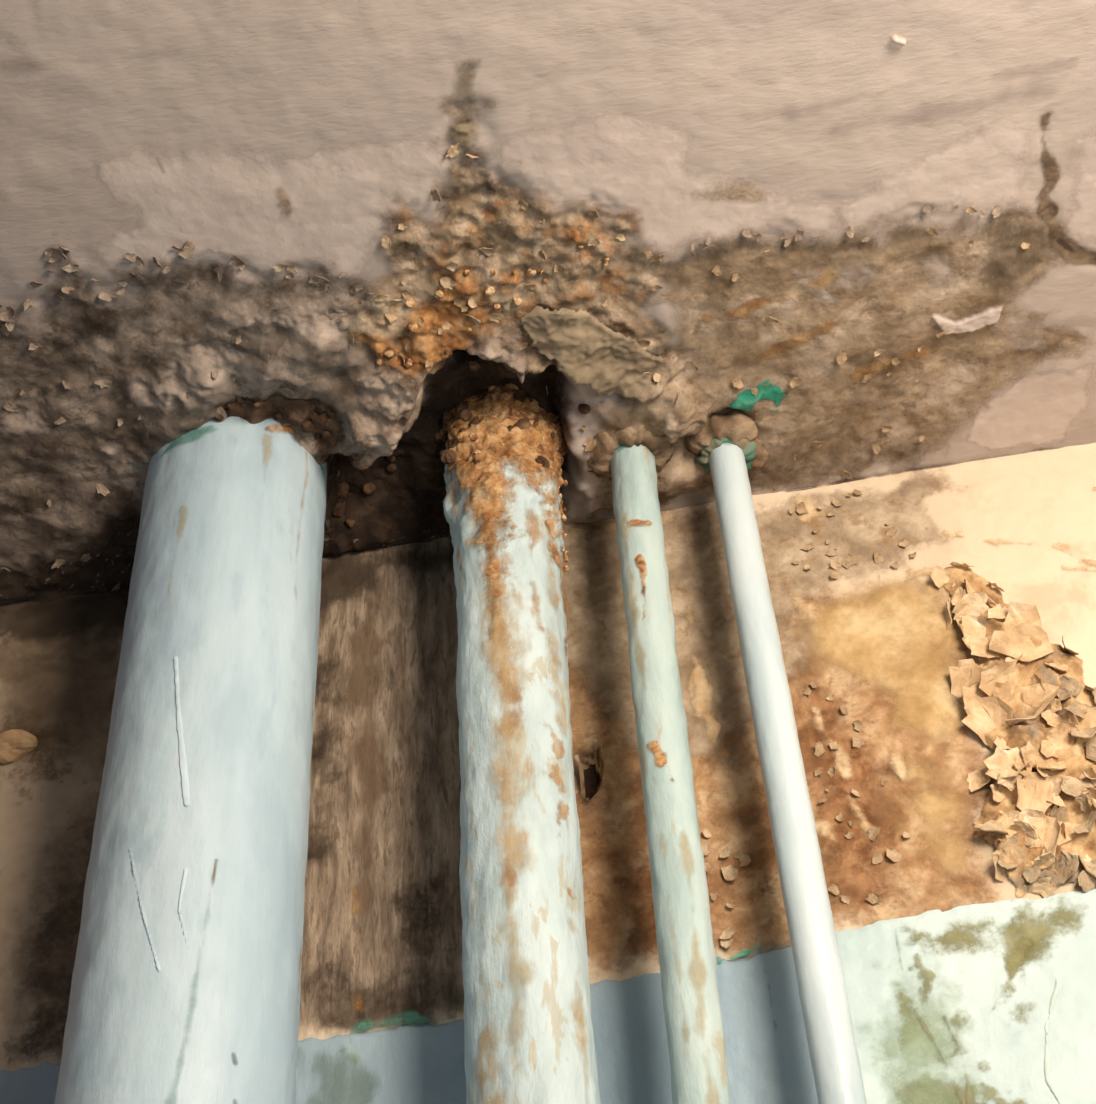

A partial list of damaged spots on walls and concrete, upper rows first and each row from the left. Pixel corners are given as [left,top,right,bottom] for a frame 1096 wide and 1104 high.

crack [1038,113,1096,265]
leakage [0,241,464,1055]
leakage [562,476,658,970]
leakage [580,205,1086,952]
mould [886,954,1023,1104]
peeling [836,561,1096,1104]
mould [1002,908,1080,991]